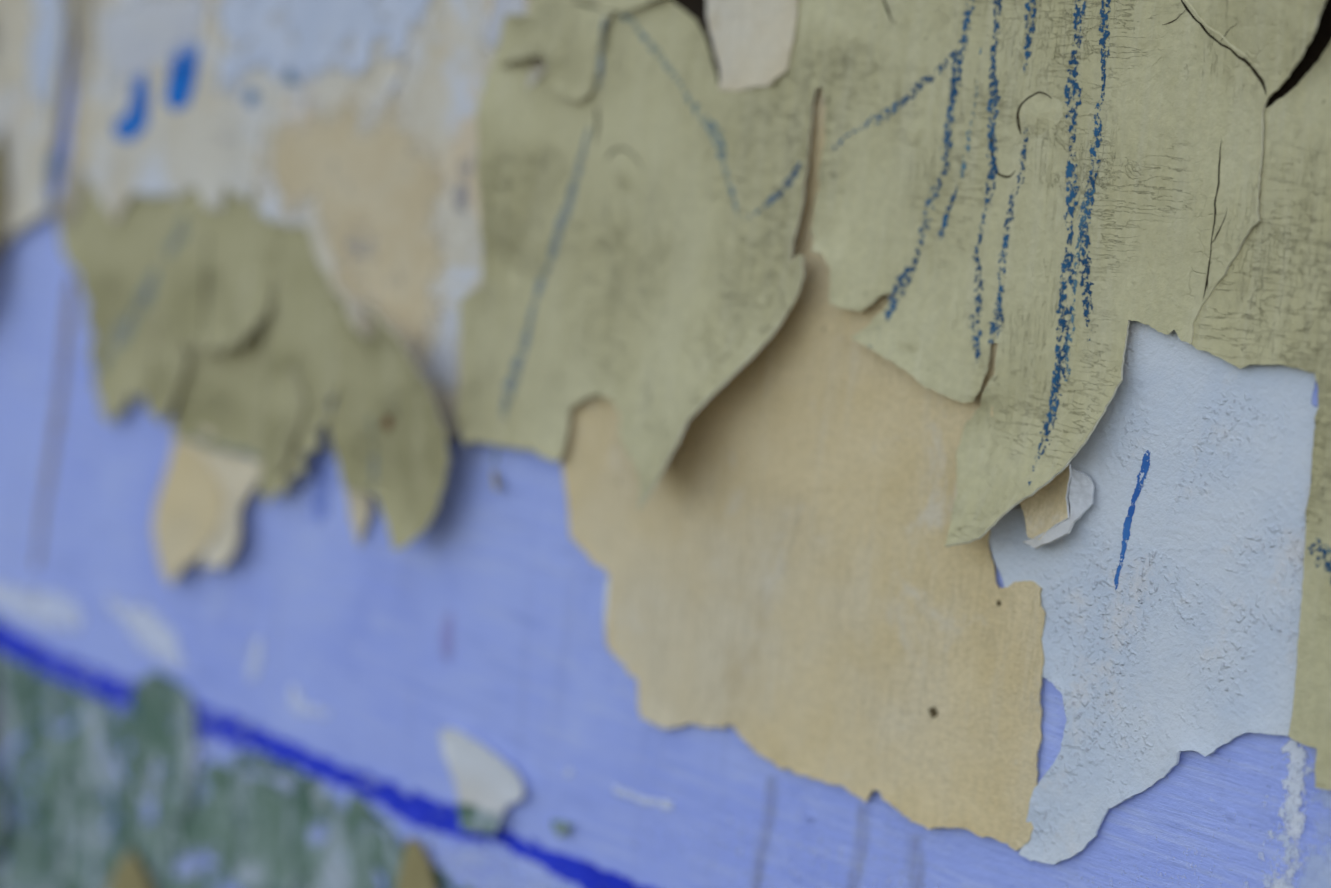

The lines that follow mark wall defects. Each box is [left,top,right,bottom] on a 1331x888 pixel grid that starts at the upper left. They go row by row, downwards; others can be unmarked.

crack [1163,0,1266,94]
peeling [0,0,69,250]
crack [1203,139,1227,298]
peeling [55,0,1327,586]
peeling [561,41,1331,864]
peeling [108,848,152,888]
peeling [123,671,198,828]
peeling [396,837,436,888]
peeling [440,728,525,836]
peeling [552,820,571,837]
efflorescence [1244,740,1331,888]